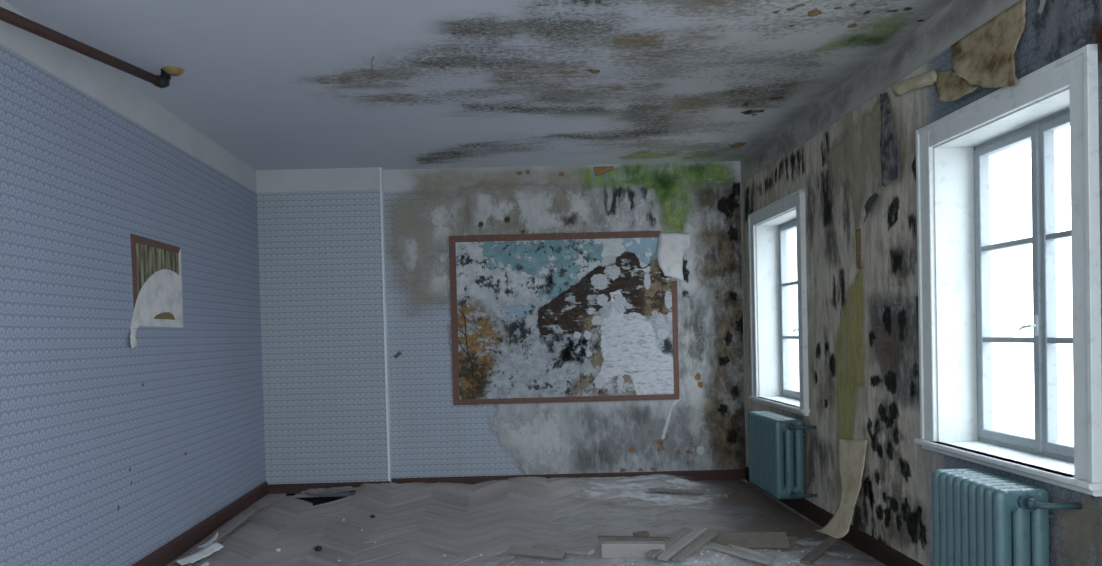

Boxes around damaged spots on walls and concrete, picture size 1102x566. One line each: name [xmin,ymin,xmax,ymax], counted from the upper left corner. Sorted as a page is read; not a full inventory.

mould [414,0,676,82]
mould [462,83,708,143]
flaking render [452,166,745,475]
damp [395,144,804,471]
peeling [816,439,868,539]
damp [807,133,927,549]